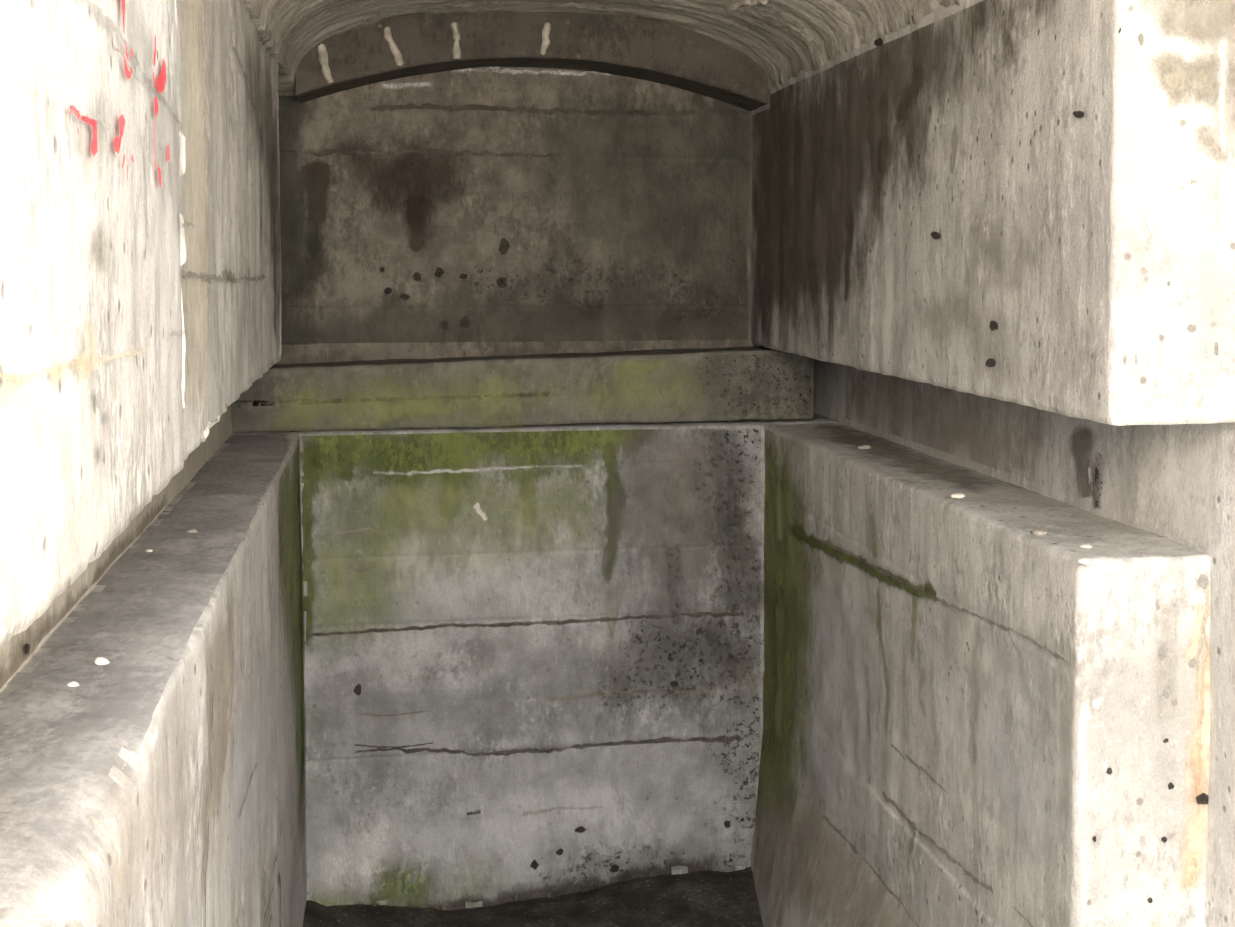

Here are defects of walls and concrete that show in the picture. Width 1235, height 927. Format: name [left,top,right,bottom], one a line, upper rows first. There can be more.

crack [0,347,147,387]
crack [182,268,265,330]
leakage [339,436,359,480]
leakage [249,0,996,415]
leakage [1156,0,1235,228]
leakage [298,447,320,784]
crack [310,612,741,636]
crack [355,735,743,756]
leakage [602,428,763,843]
rust [1179,608,1210,891]